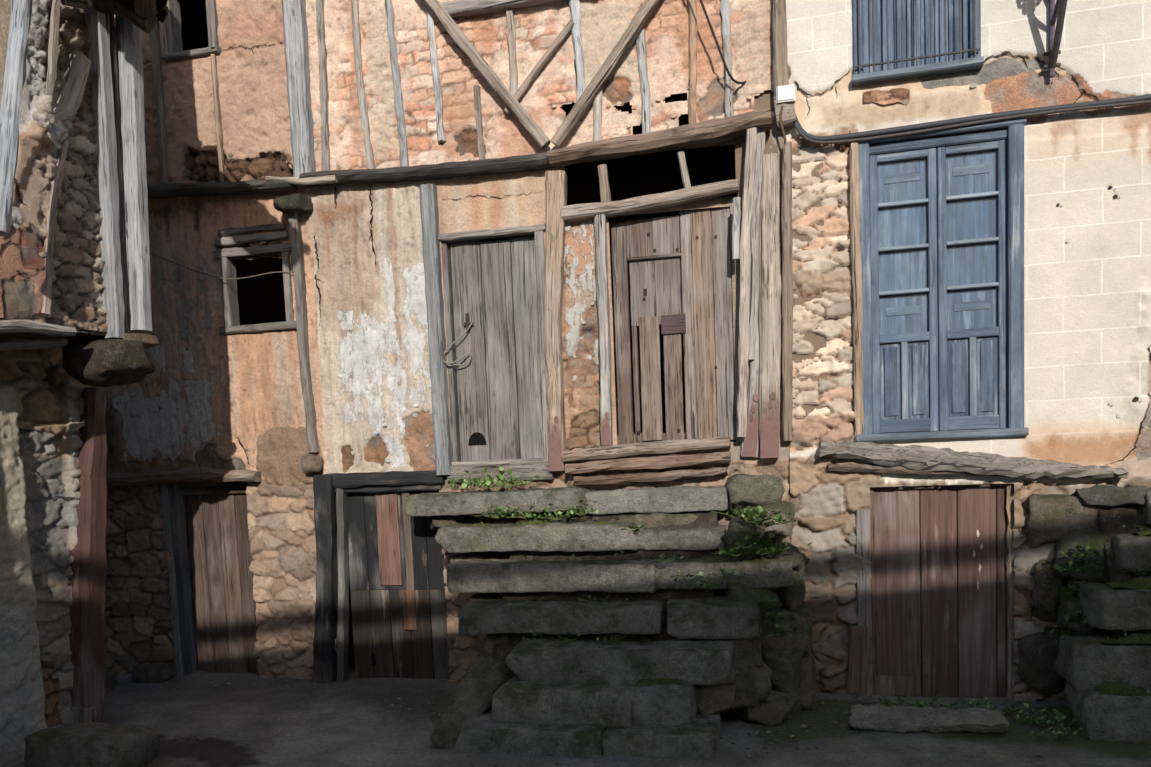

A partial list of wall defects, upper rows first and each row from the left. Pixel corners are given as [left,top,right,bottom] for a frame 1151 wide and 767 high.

spalling [863,88,910,105]
spalling [917,57,1150,124]
spalling [182,147,294,183]
peeling [149,213,165,301]
spalling [216,241,282,260]
peeling [334,252,436,472]
peeling [548,218,611,471]
peeling [112,333,245,470]
crack [1107,404,1150,465]